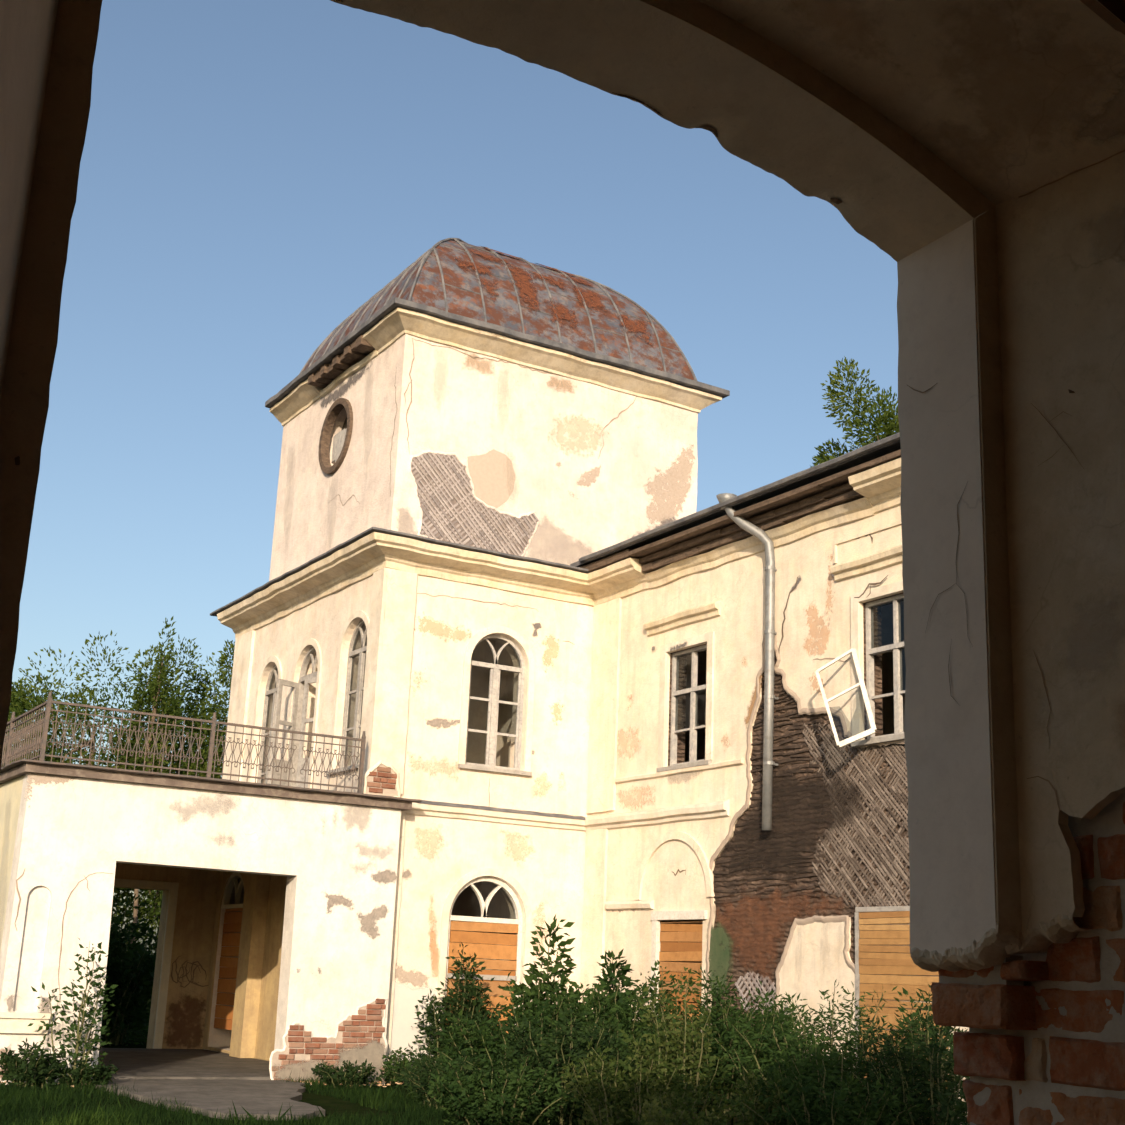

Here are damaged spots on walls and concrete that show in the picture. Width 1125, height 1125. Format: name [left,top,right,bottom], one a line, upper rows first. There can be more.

corrosion [455,246,605,329]
corrosion [620,314,654,345]
crack [390,338,563,495]
flaking render [408,449,541,556]
flaking render [647,445,695,523]
crack [778,577,798,651]
crack [925,482,973,702]
flaking render [362,760,401,797]
flaking render [705,634,910,1014]
flaking render [326,894,387,939]
flaking render [910,793,1125,1125]
flaking render [269,996,388,1085]